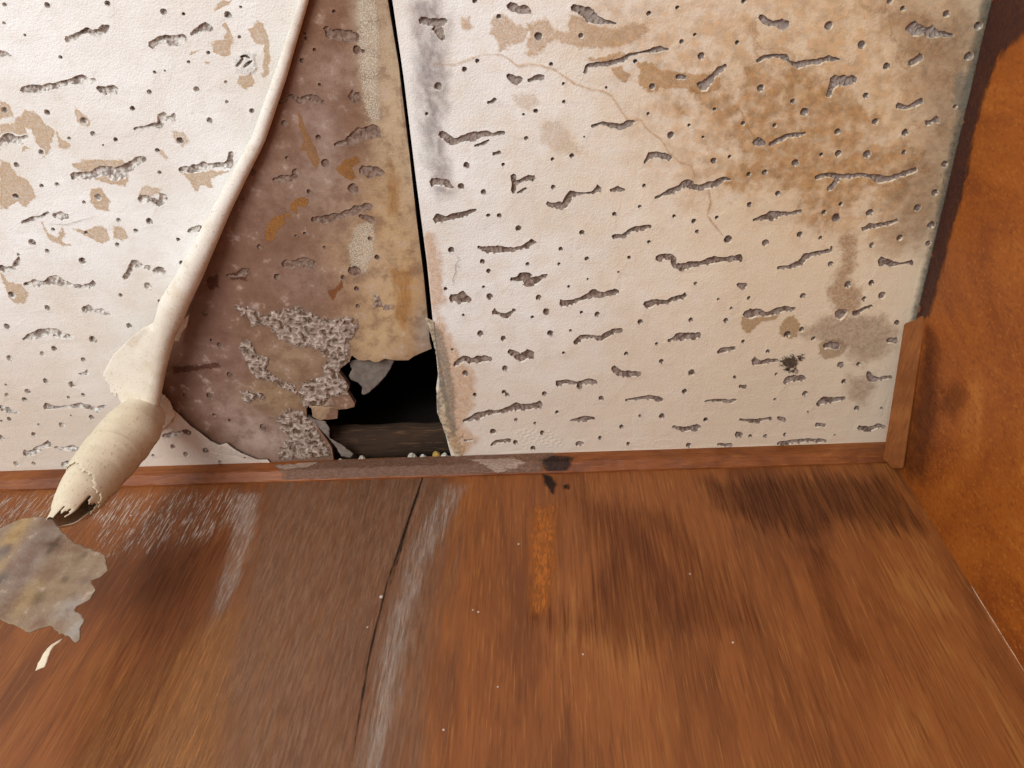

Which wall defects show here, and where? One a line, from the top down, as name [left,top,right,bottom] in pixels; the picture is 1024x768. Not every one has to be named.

damp [490,0,1024,318]
peeling [0,0,432,671]
damp [542,456,571,494]
damp [779,354,805,374]
damp [741,236,890,358]
damp [83,489,257,768]
crack [354,478,422,744]